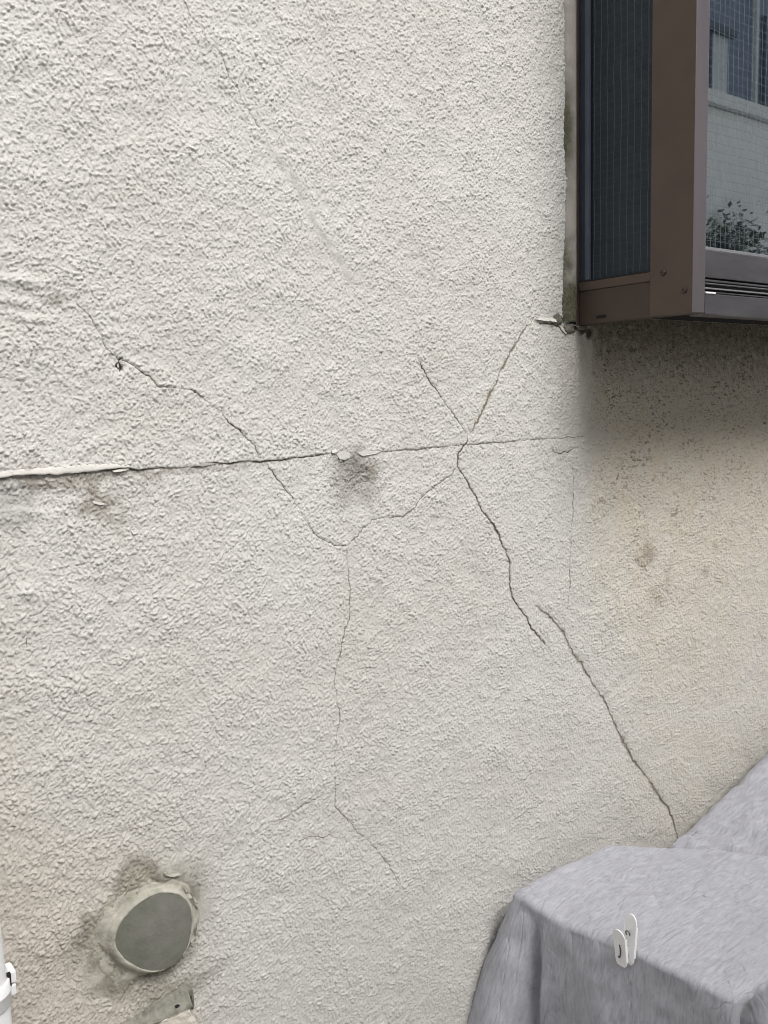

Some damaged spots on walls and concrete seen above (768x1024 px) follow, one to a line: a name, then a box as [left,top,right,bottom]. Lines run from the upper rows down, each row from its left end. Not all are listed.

crack [77,304,203,398]
crack [0,321,678,838]